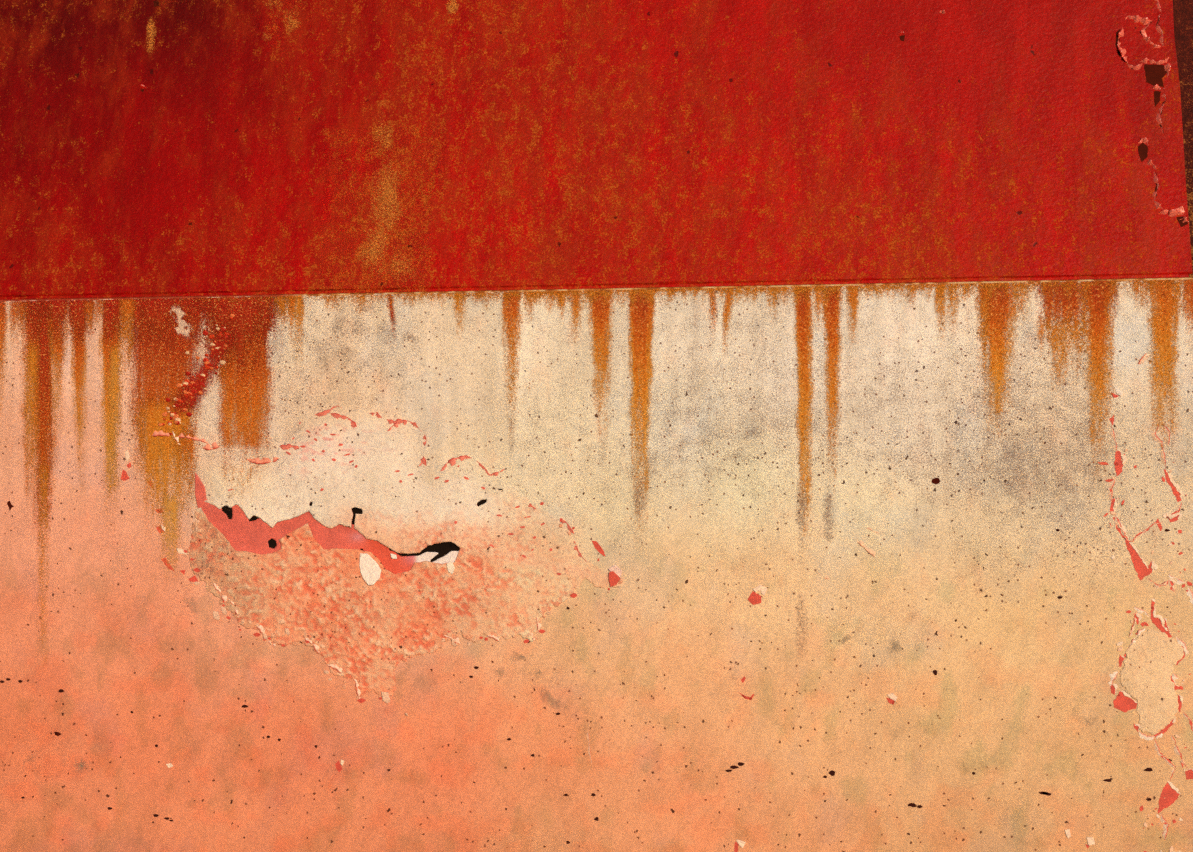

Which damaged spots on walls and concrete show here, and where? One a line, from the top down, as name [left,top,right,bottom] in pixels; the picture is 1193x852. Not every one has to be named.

peeling [1116,0,1172,107]
peeling [1138,137,1157,169]
rust [359,163,411,276]
peeling [1154,201,1189,227]
rust [0,279,1193,591]
peeling [1098,449,1128,480]
peeling [1109,498,1193,604]
peeling [1156,469,1184,546]
peeling [1109,599,1189,740]
peeling [1143,761,1193,828]